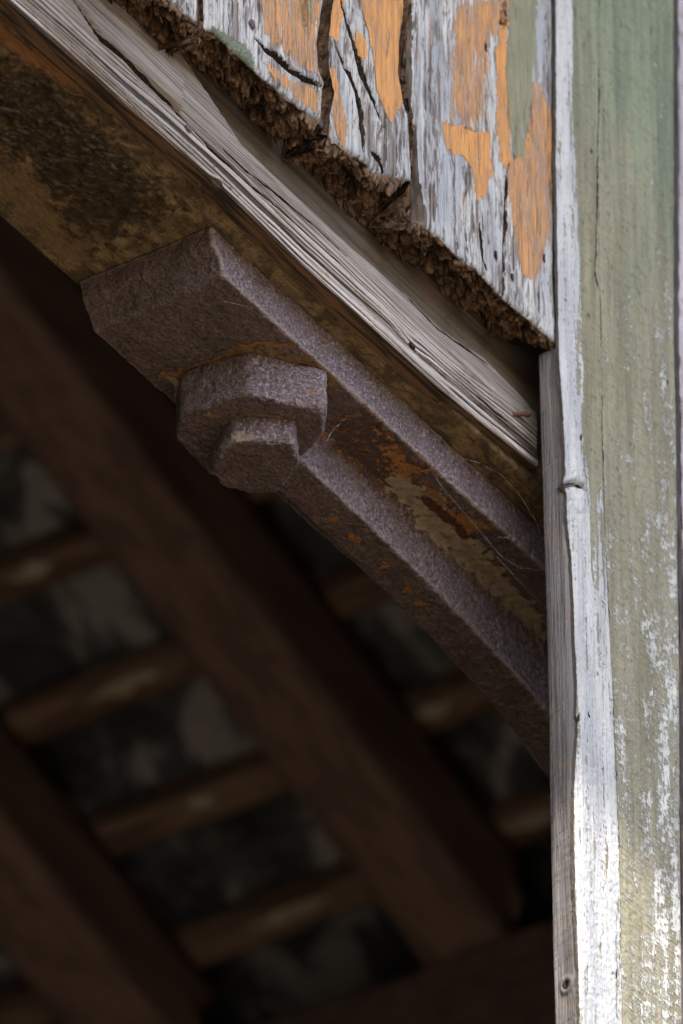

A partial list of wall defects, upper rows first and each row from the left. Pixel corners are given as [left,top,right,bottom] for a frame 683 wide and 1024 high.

crack [74,1,340,264]
peeling [260,0,347,149]
crack [337,1,385,176]
peeling [353,0,404,122]
corrosion [158,338,337,406]
corrosion [321,403,547,658]
peeling [440,0,681,1024]